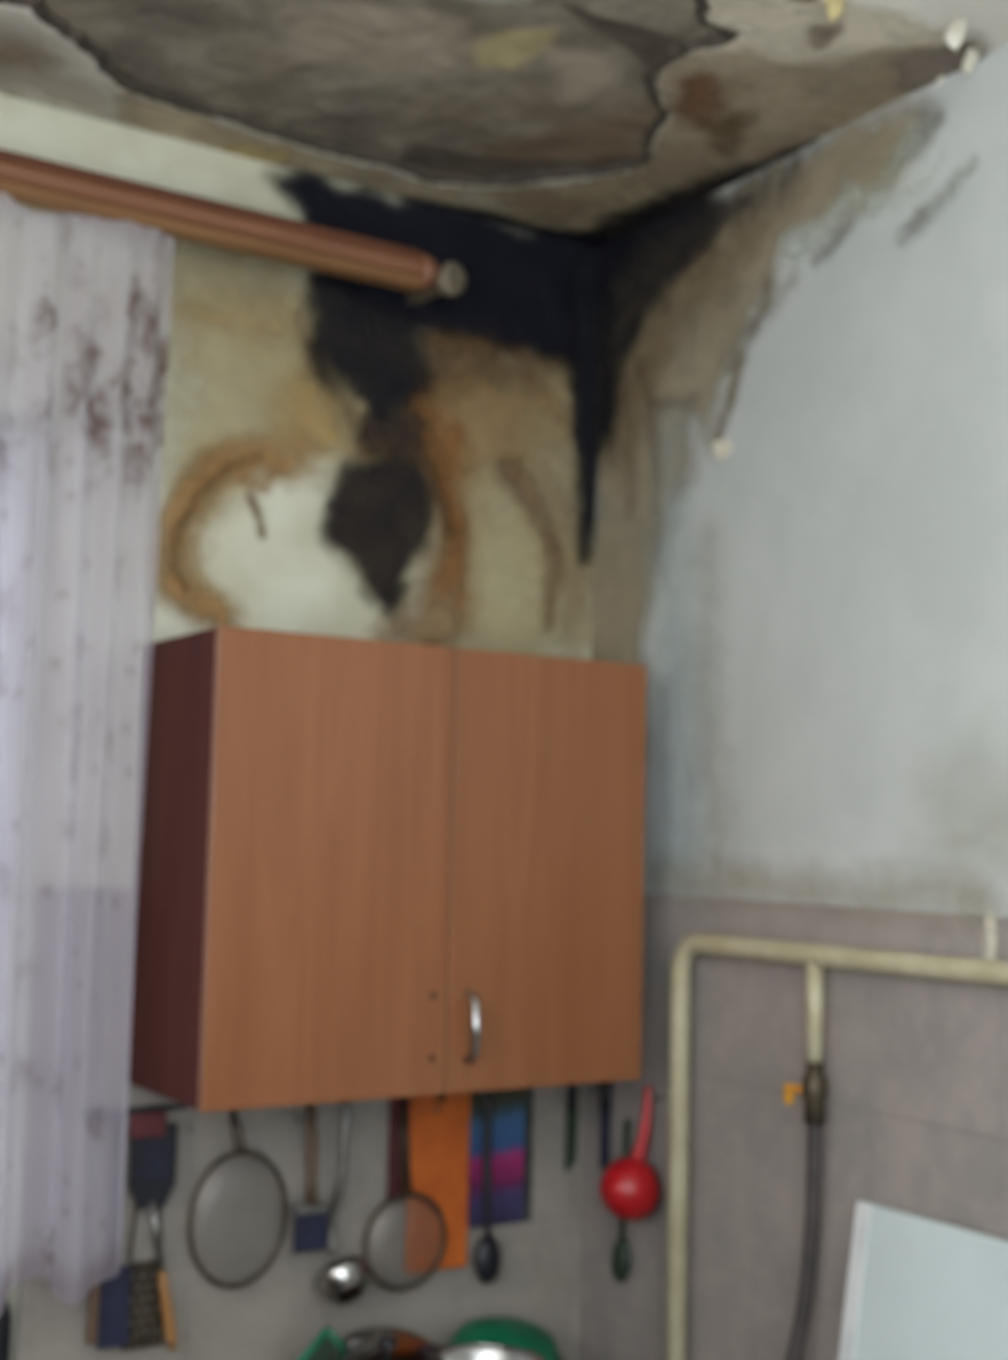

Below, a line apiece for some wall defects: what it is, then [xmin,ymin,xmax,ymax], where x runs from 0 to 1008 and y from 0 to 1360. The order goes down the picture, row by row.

flaking render [0,0,982,206]
damp [119,93,939,665]
corrosion [161,440,305,626]